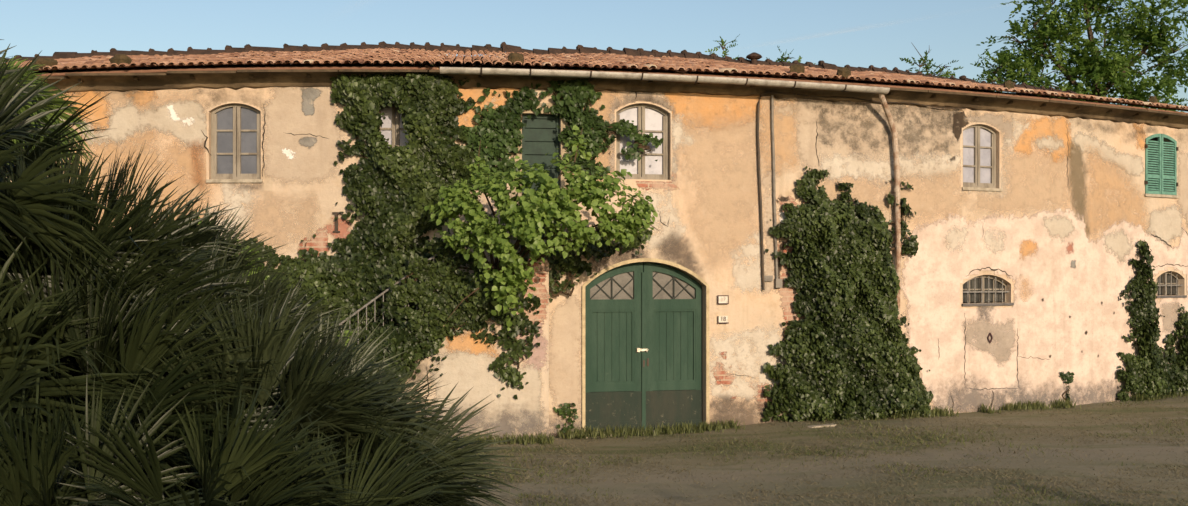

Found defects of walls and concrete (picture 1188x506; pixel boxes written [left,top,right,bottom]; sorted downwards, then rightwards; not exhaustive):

peeling [59,89,254,243]
peeling [262,86,345,184]
flaking render [298,218,352,261]
peeling [572,89,1188,413]
peeling [430,259,582,437]